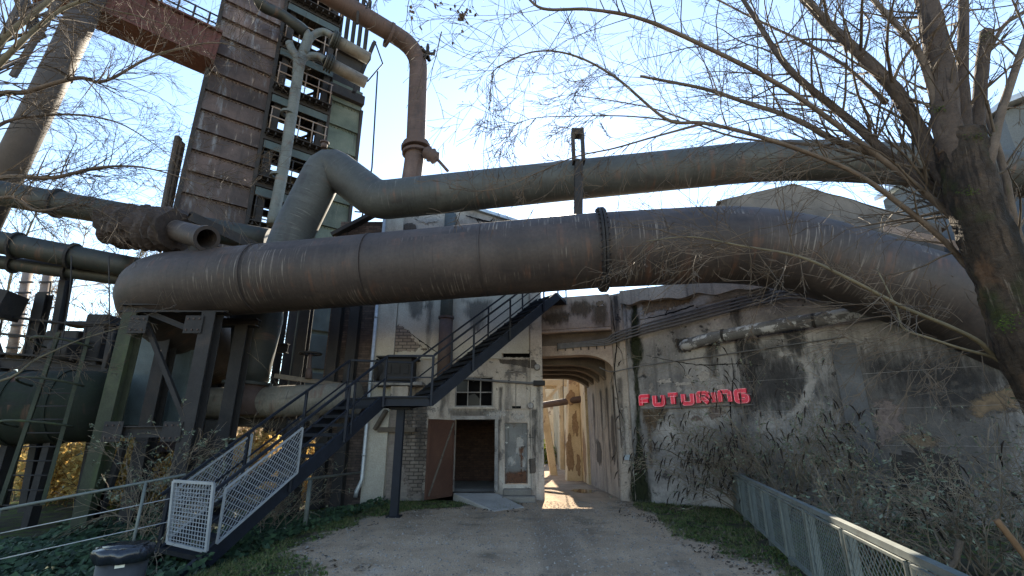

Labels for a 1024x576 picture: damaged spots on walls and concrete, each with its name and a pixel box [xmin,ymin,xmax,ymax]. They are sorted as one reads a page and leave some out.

flaking render [394,324,427,352]
flaking render [402,406,428,498]
damp [543,296,651,503]
damp [746,329,816,438]